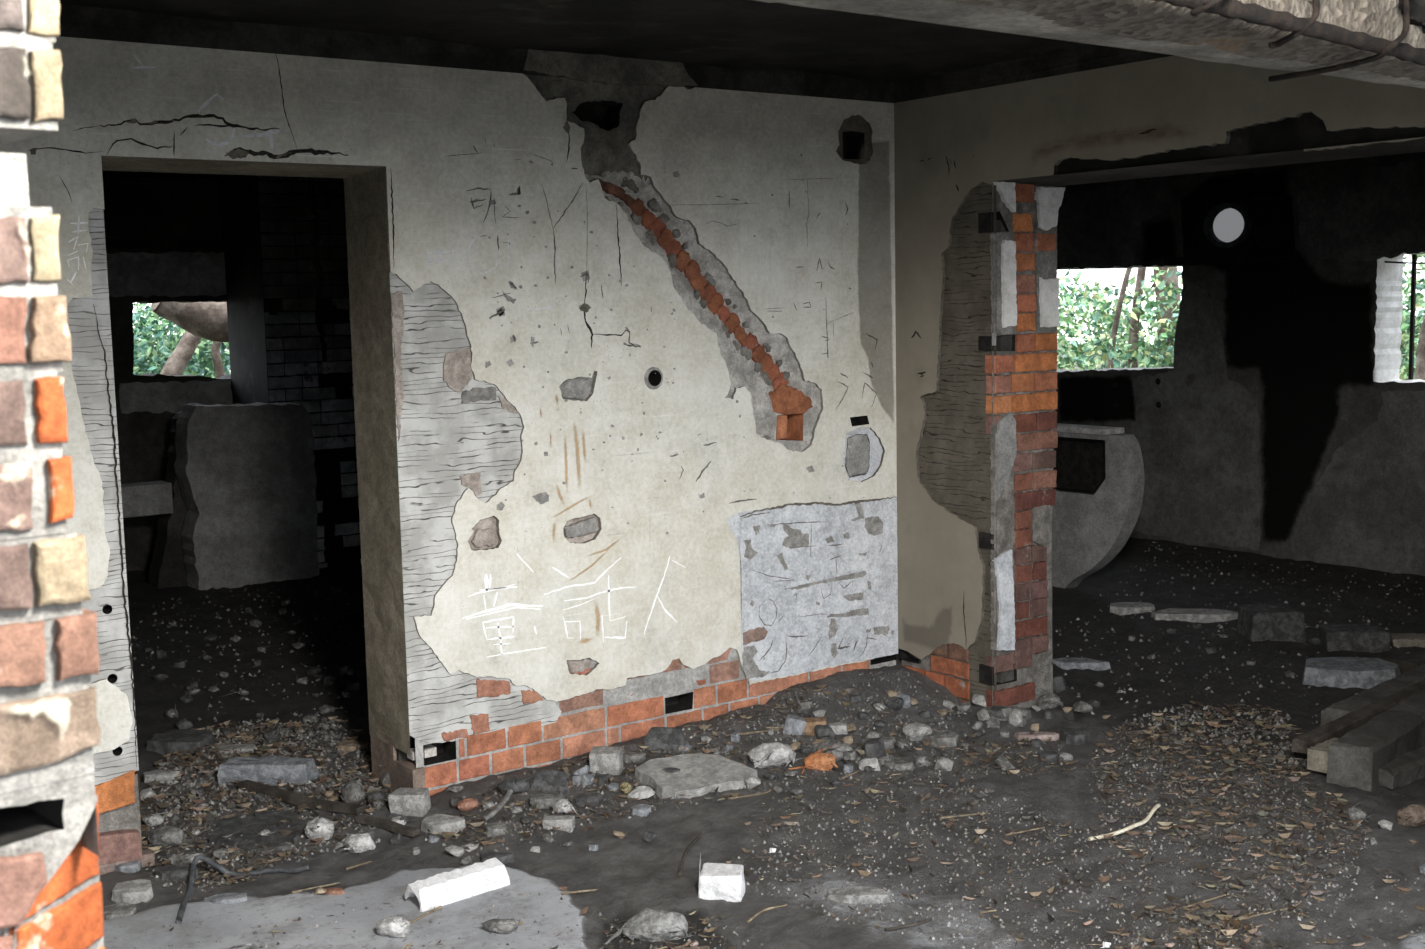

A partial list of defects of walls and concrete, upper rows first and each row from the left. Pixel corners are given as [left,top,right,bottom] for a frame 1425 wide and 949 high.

spalling [1153,0,1425,82]
crack [28,56,349,202]
spalling [523,49,823,473]
spalling [67,209,262,875]
spalling [367,182,1111,809]
spalling [479,798,531,824]
spalling [530,828,598,853]
spalling [613,831,658,842]